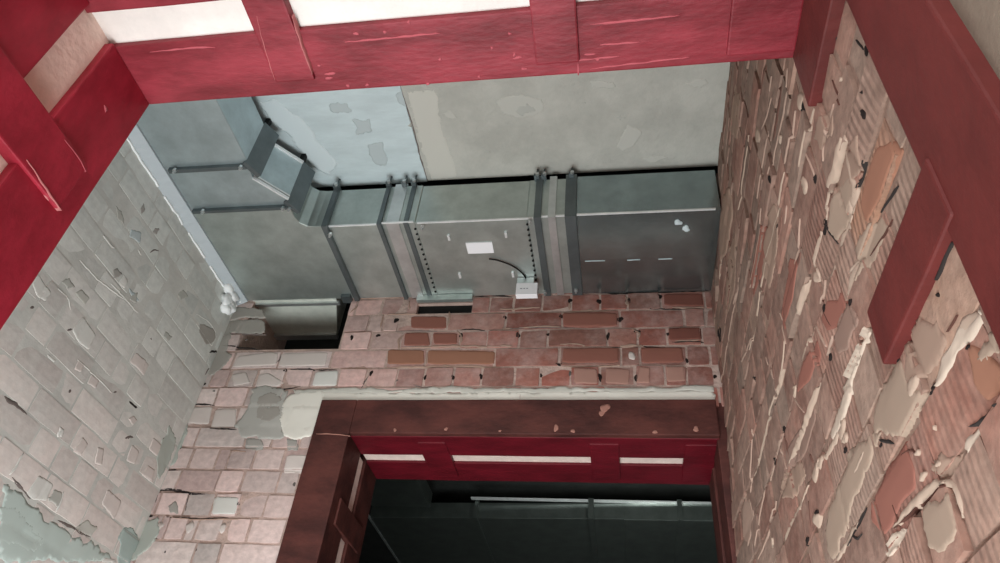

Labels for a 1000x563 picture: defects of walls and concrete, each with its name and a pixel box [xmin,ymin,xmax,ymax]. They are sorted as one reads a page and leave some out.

spalling [860,141,904,222]
spalling [968,345,1000,400]
crack [155,438,228,519]
spalling [785,407,816,470]
spalling [871,441,916,534]